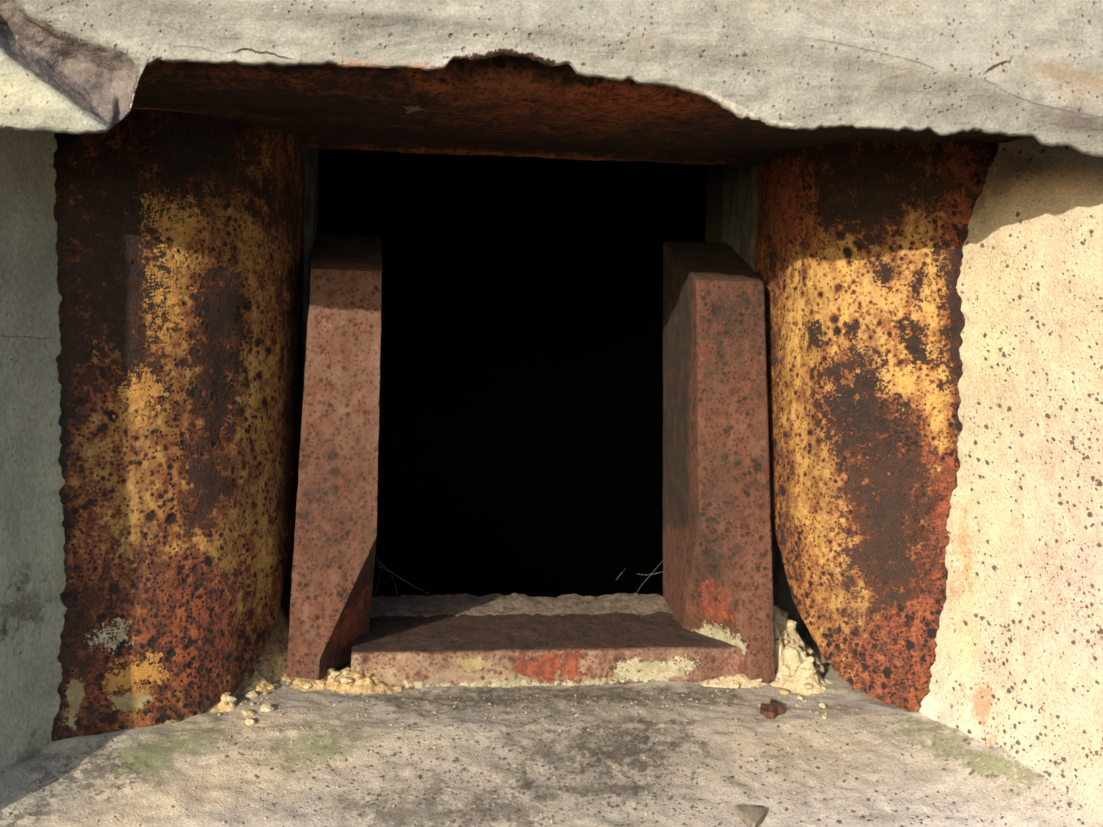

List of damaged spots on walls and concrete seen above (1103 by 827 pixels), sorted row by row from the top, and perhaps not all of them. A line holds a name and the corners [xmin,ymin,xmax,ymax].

spalling [0,0,141,126]
spalling [452,48,555,66]
spalling [688,86,795,127]
rust [53,133,261,541]
rust [801,142,996,613]
rust [57,579,123,683]
rust [324,580,372,655]
rust [511,649,587,683]